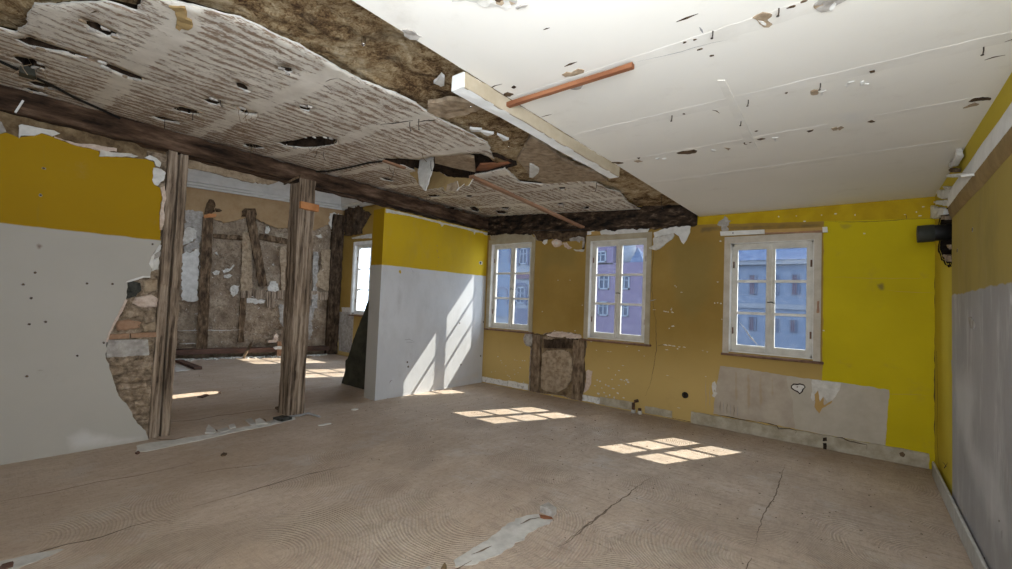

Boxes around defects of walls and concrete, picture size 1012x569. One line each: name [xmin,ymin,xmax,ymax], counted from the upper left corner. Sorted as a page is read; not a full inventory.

spalling [87,21,116,35]
spalling [14,30,86,57]
spalling [103,64,142,80]
spalling [438,67,463,80]
spalling [280,136,337,147]
spalling [188,160,278,185]
spalling [383,158,420,169]
spalling [433,153,517,178]
spalling [386,209,691,252]
spalling [19,124,167,436]
flaking render [339,307,354,353]
spalling [497,330,629,401]